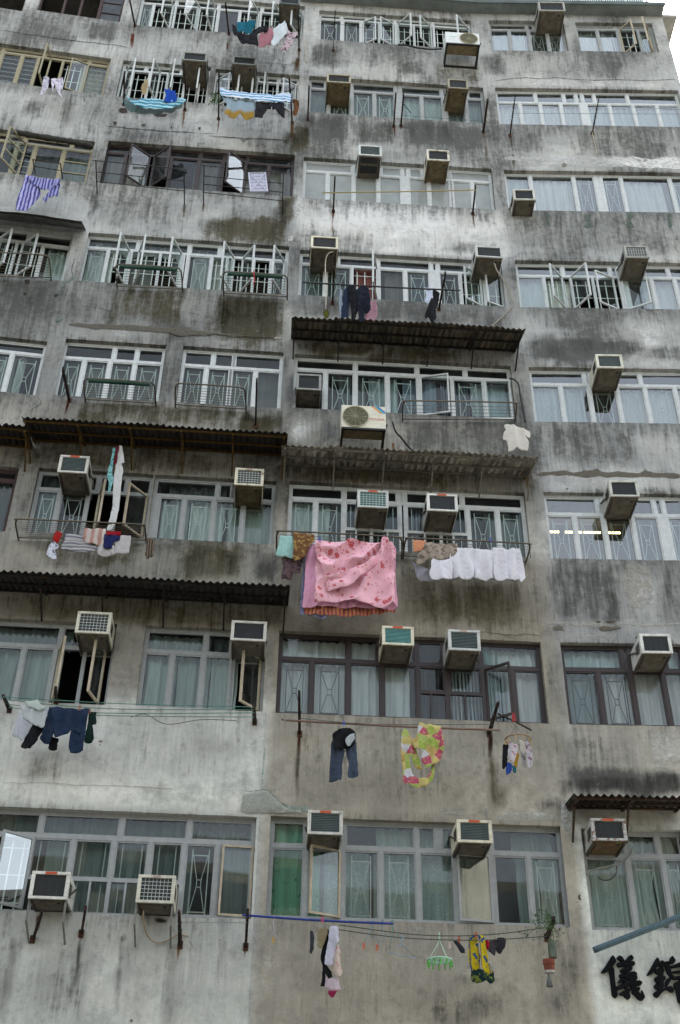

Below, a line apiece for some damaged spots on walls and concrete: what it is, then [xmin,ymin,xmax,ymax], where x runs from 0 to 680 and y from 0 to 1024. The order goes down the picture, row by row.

flaking render [55,318,232,345]
flaking render [538,469,680,479]